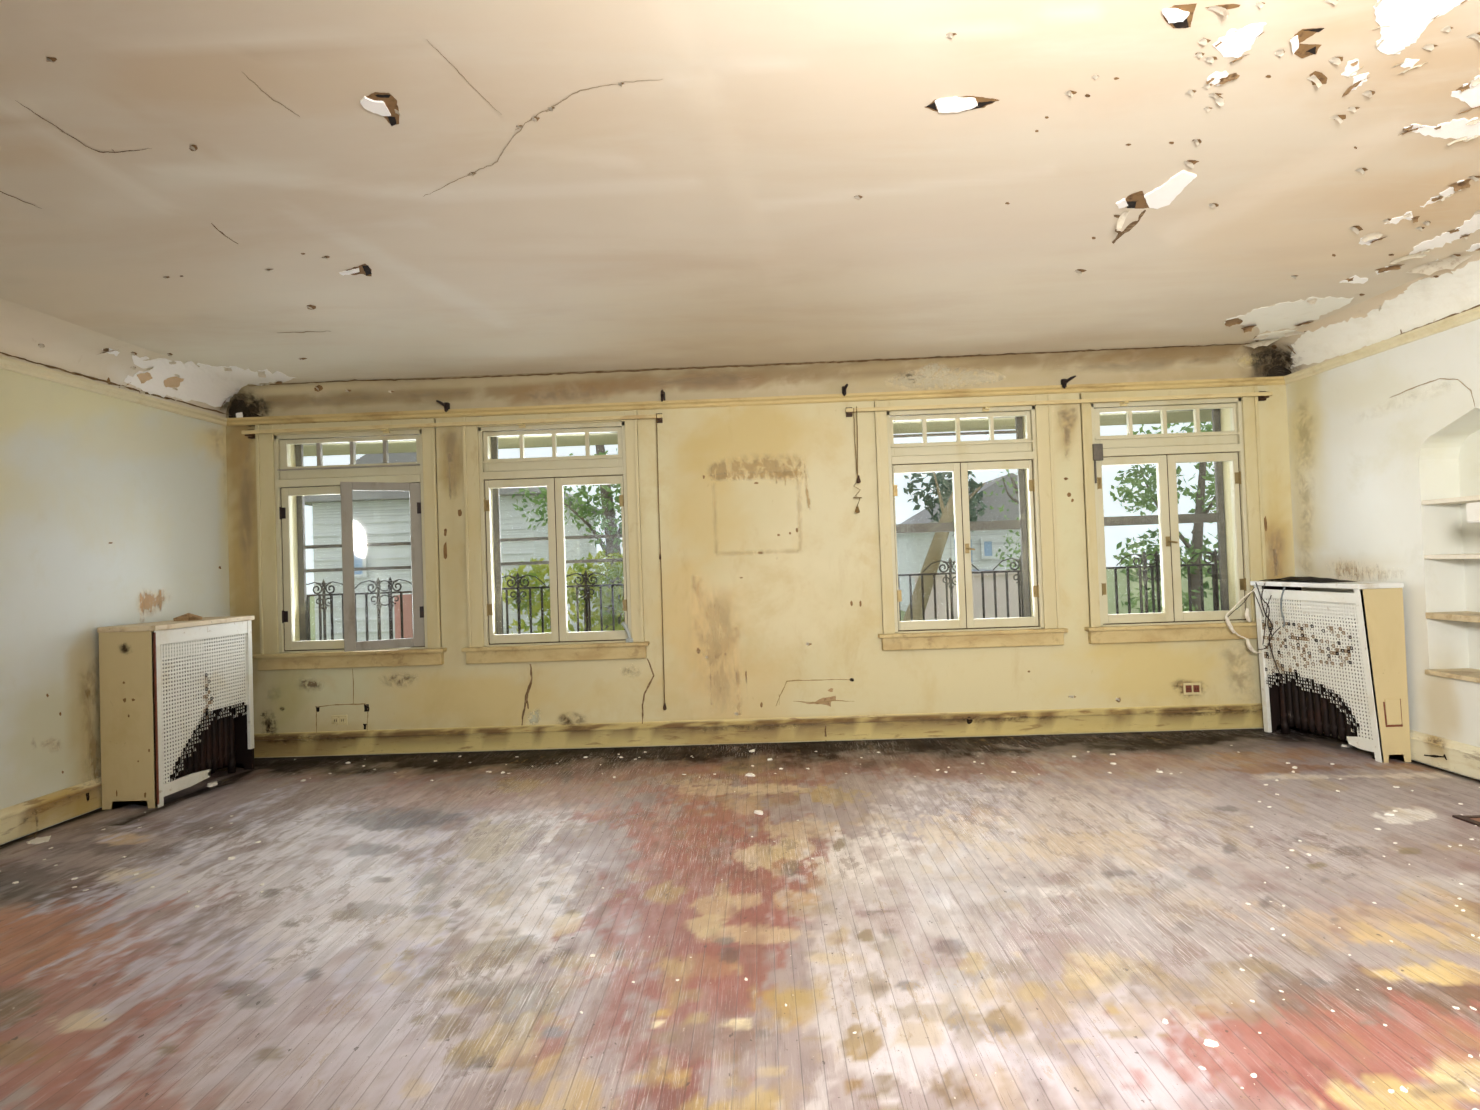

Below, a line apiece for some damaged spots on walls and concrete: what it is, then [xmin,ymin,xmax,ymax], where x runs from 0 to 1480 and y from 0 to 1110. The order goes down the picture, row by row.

crack [15,100,150,153]
flaking render [360,92,401,126]
crack [423,39,662,197]
peeling [1162,1,1266,112]
flaking render [1274,28,1375,124]
peeling [1373,0,1480,74]
peeling [1400,75,1480,145]
flaking render [1116,139,1202,231]
peeling [1224,176,1480,377]
peeling [97,348,295,427]
crack [522,664,532,725]
crack [642,659,654,724]